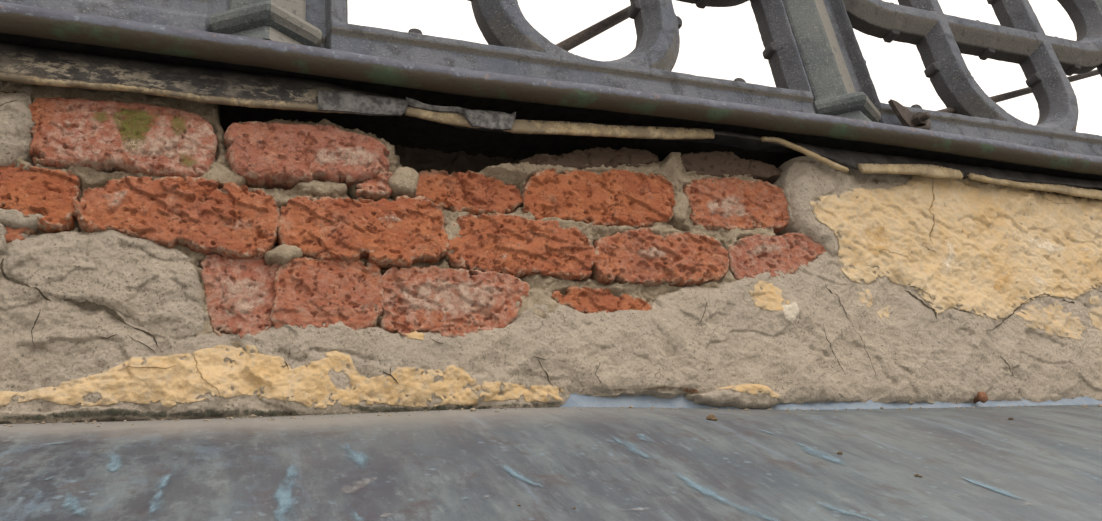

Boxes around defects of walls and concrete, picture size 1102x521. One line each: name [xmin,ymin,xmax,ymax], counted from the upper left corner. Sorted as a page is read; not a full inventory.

crack [0,258,221,397]
spalling [0,81,1102,409]